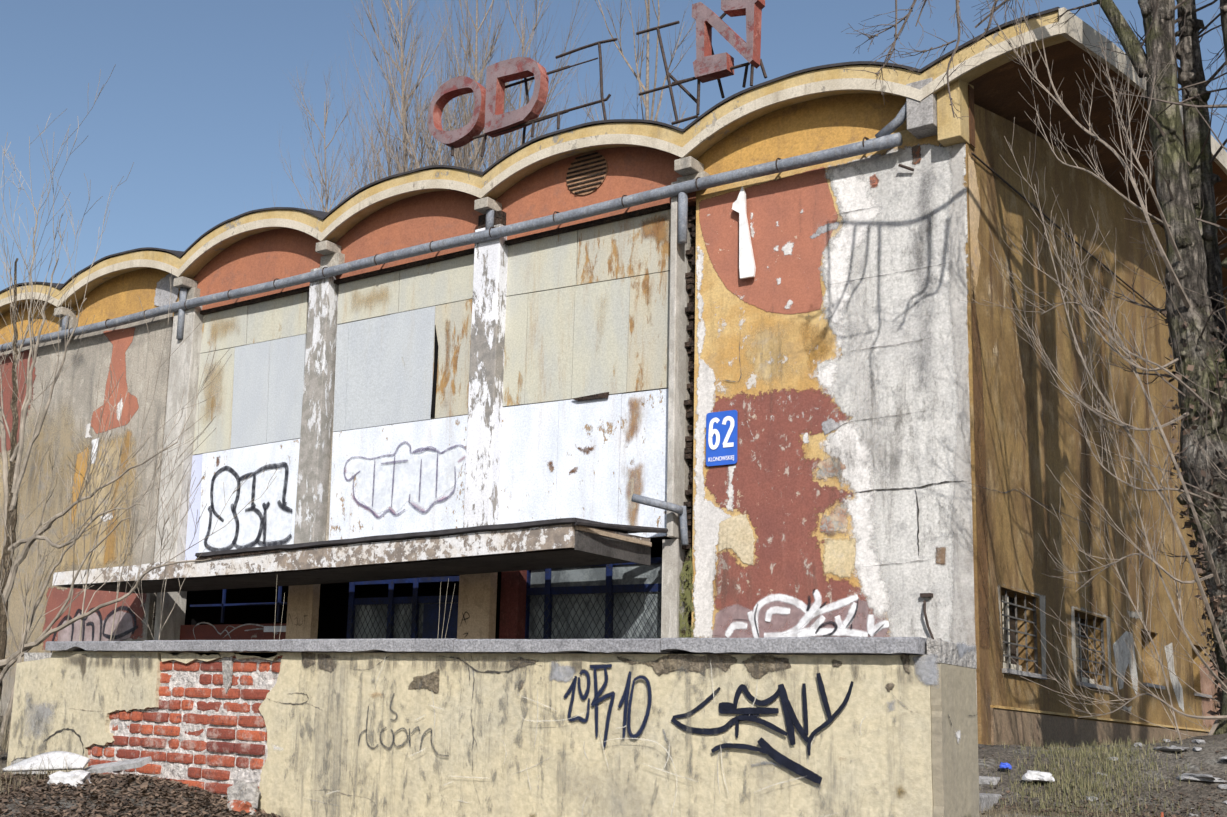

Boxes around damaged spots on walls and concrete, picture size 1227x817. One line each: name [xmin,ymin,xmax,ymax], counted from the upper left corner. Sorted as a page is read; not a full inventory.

corrosion [642,217,668,242]
peeling [774,242,794,255]
peeling [803,143,981,658]
peeling [85,423,98,463]
peeling [693,246,755,638]
peeling [196,547,307,562]
flaking render [408,669,440,694]
flaking render [617,653,791,679]
peeling [901,654,938,685]
flaking render [87,651,283,799]